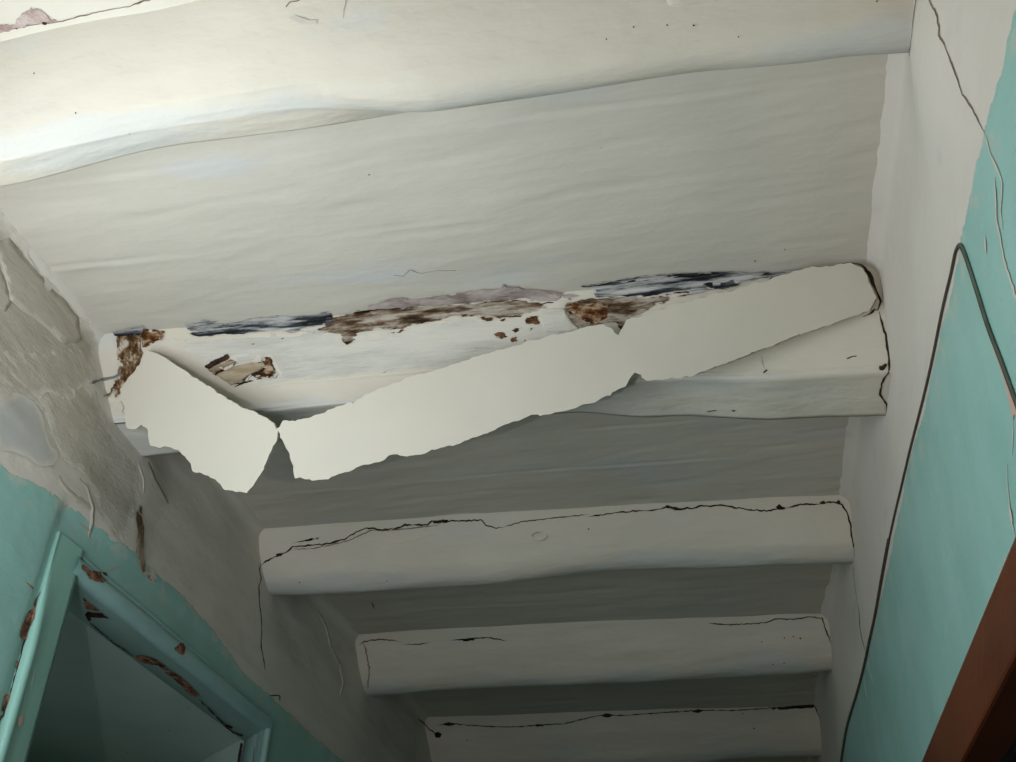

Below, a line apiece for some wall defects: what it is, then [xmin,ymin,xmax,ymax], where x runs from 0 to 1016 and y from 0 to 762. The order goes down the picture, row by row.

crack [14,0,150,29]
crack [909,0,1016,299]
water stain [112,326,144,336]
water stain [177,312,333,337]
peeling [0,215,169,545]
flaking render [120,263,877,493]
peeling [992,346,1016,420]
peeling [81,558,122,583]
crack [258,500,865,667]
crack [419,705,821,738]